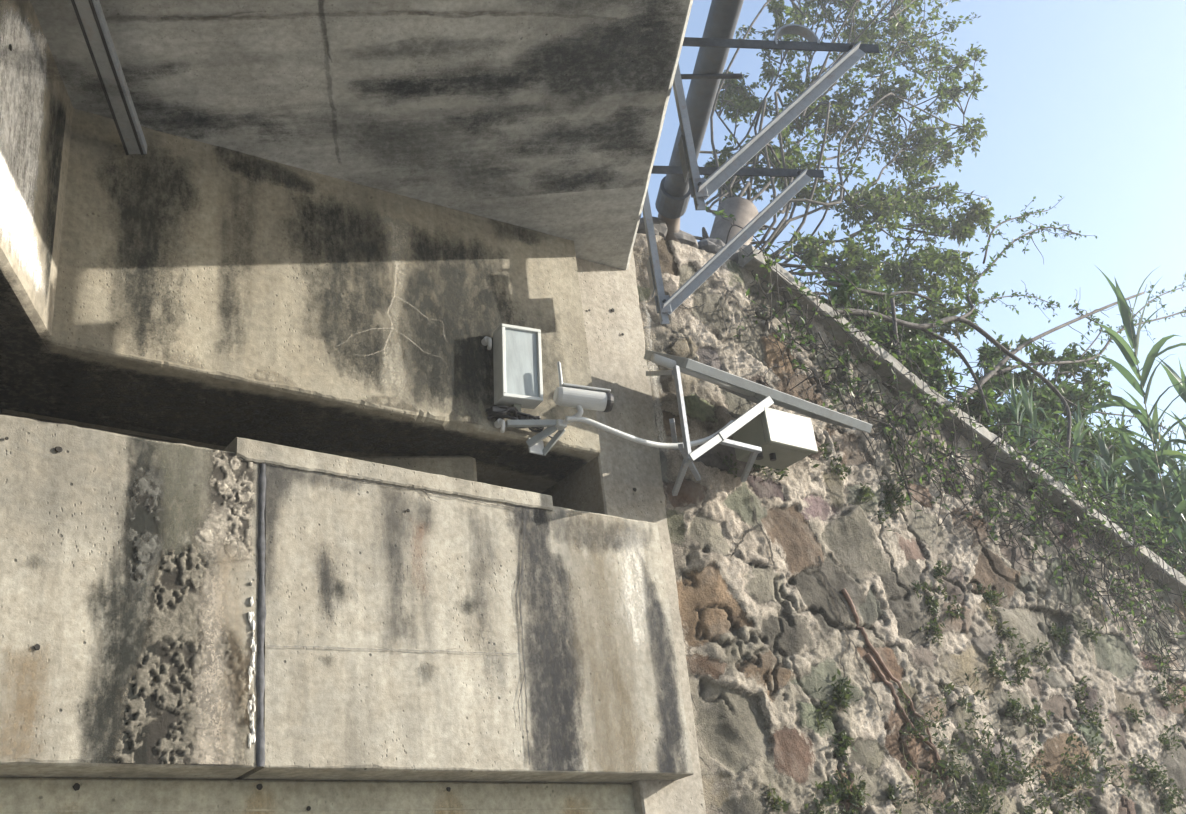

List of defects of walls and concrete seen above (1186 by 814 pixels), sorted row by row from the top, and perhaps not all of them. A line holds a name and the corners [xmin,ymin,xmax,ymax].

water stain [0,9,66,293]
water stain [106,154,197,344]
water stain [133,102,275,139]
water stain [216,146,510,394]
water stain [365,0,679,105]
water stain [516,113,651,155]
spalling [113,450,257,765]
water stain [0,269,587,771]
water stain [618,532,682,773]